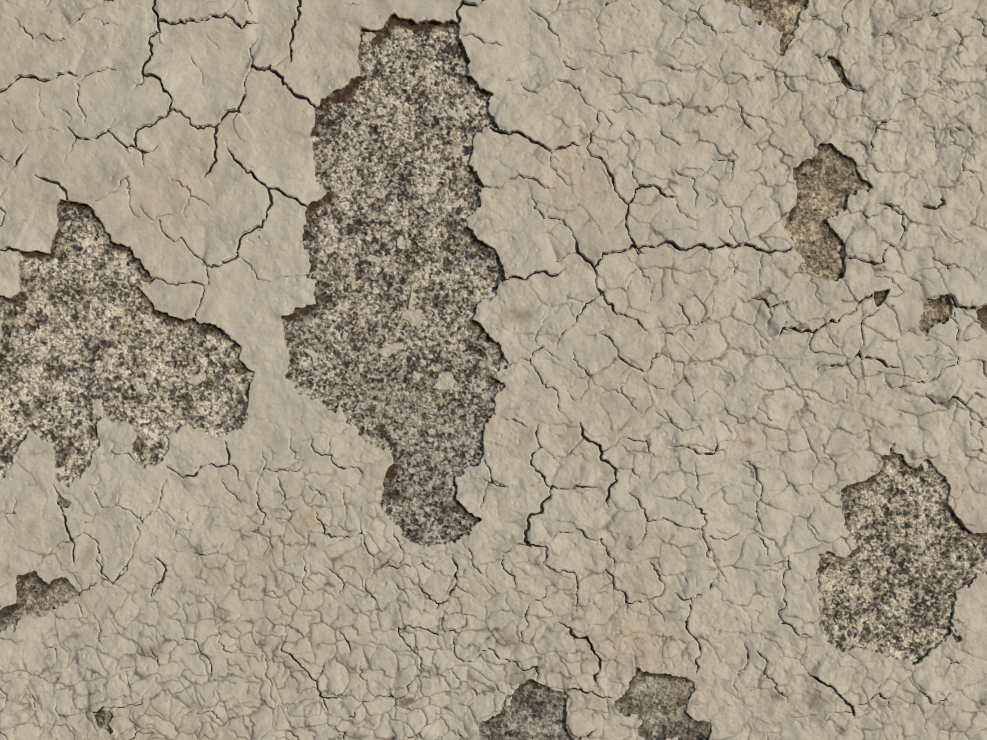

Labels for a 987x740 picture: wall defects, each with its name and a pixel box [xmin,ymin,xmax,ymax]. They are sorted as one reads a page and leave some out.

peeling [724,0,808,56]
peeling [0,204,255,515]
crack [0,0,315,316]
peeling [280,24,509,546]
crack [485,0,987,455]
peeling [784,145,872,281]
peeling [0,571,80,632]
crack [47,333,811,740]
peeling [479,674,571,740]
peeling [614,667,712,740]
crack [807,672,893,727]
peeling [816,443,987,664]